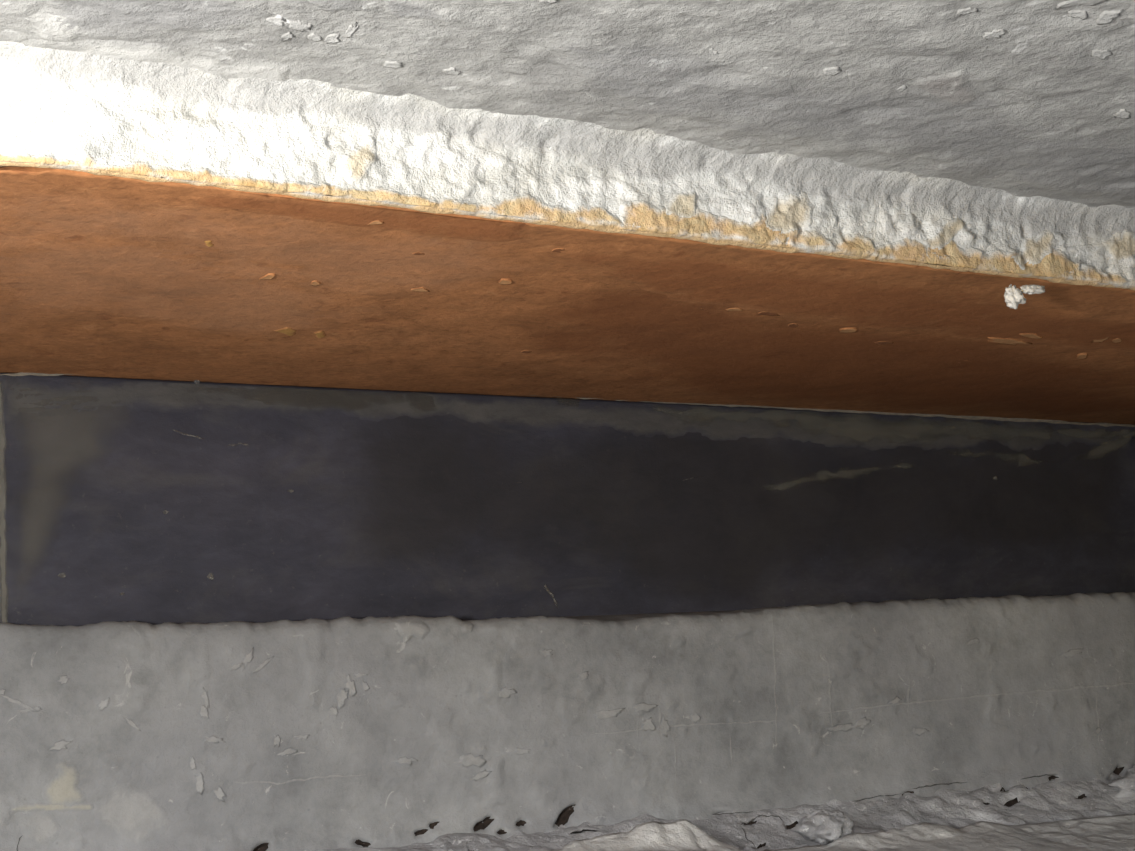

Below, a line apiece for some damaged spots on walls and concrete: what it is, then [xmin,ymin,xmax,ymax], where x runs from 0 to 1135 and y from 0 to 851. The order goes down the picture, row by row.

efflorescence [330,83,407,97]
efflorescence [17,83,127,159]
efflorescence [141,110,347,172]
efflorescence [389,131,516,183]
leakage [539,27,1135,207]
leakage [0,173,558,338]
efflorescence [695,192,773,224]
efflorescence [861,213,948,244]
efflorescence [952,227,987,248]
efflorescence [1059,243,1135,268]
leakage [2,376,1135,558]